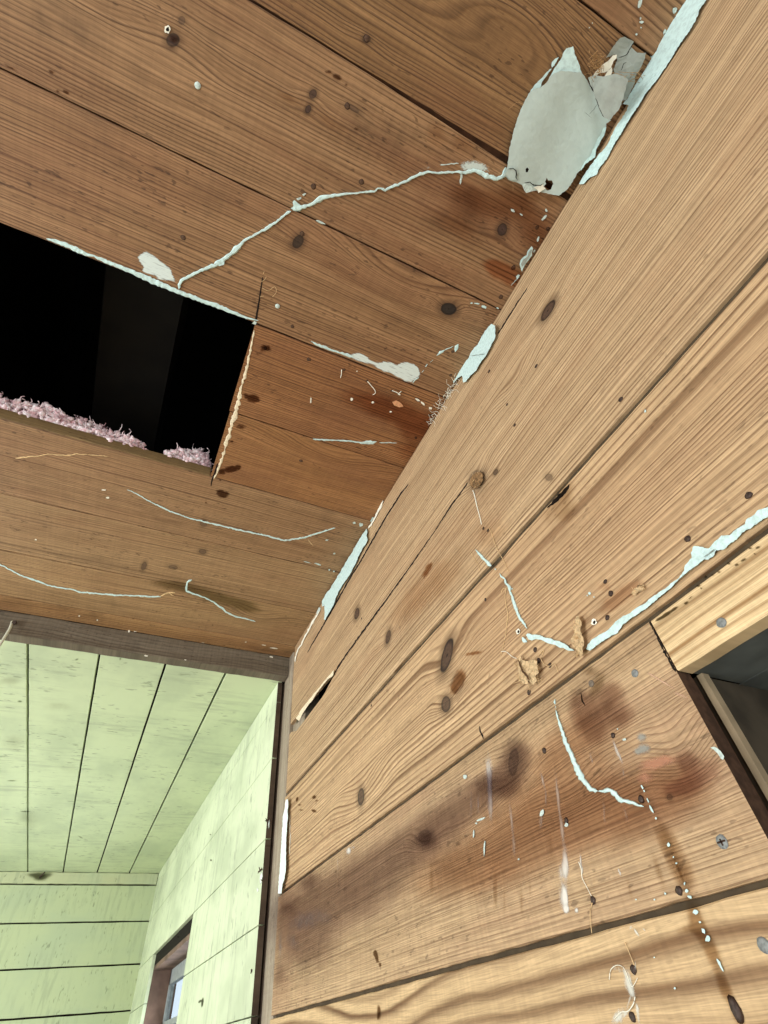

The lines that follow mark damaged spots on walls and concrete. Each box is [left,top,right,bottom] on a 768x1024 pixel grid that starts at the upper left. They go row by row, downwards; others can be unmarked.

peeling [579,0,706,184]
peeling [453,324,495,383]
crack [128,490,334,543]
crack [0,564,255,622]
peeling [316,529,368,620]
damp [542,777,583,913]